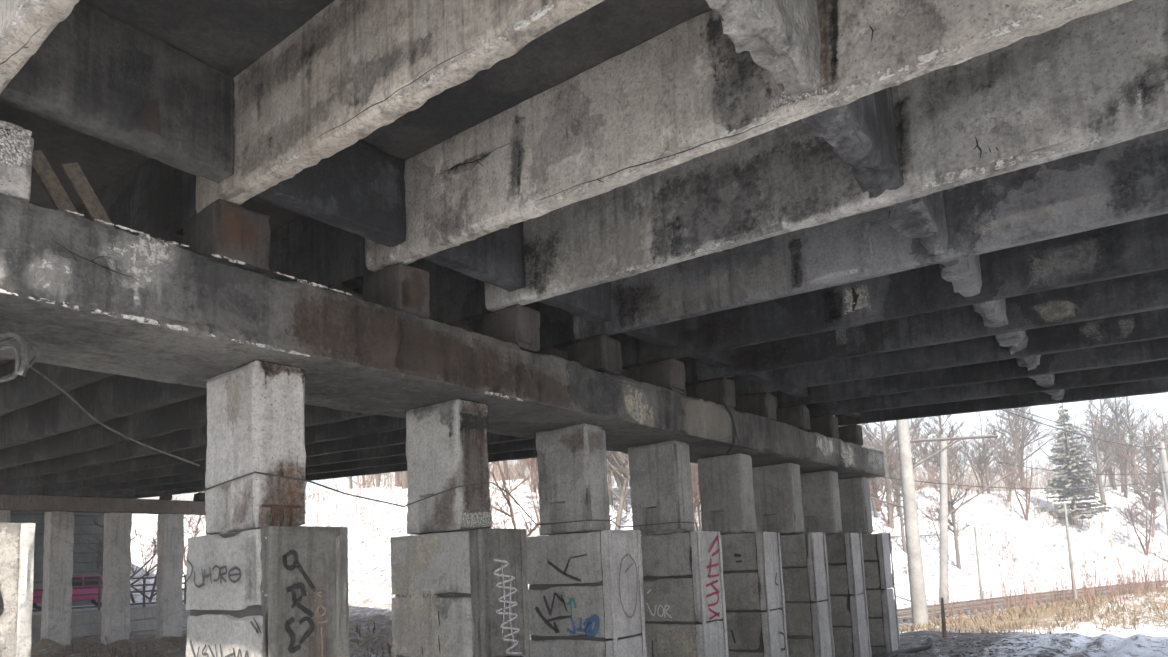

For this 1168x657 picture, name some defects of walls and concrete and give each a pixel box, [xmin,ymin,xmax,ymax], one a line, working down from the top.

spalling [0,121,32,168]
crack [311,46,475,142]
crack [440,143,509,174]
damp [509,141,524,192]
crack [537,120,771,201]
damp [701,15,775,131]
spalling [537,45,960,207]
damp [650,137,856,263]
damp [1107,143,1168,215]
rust [259,463,306,526]